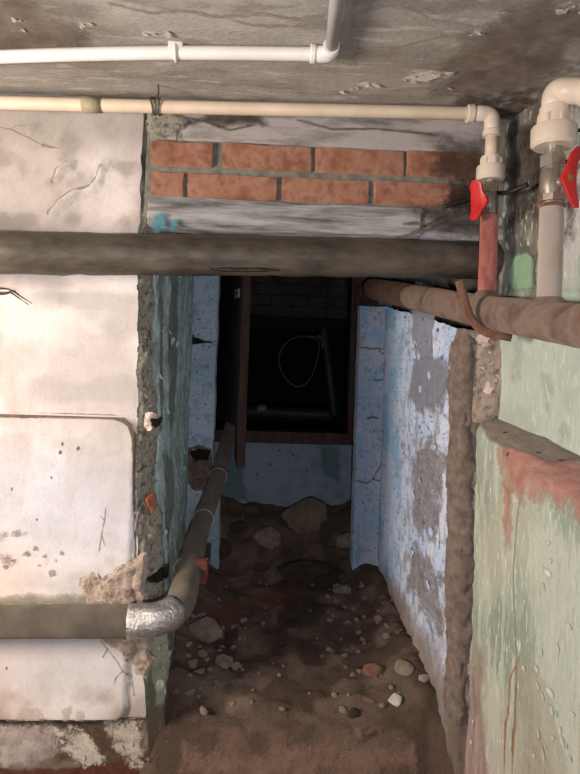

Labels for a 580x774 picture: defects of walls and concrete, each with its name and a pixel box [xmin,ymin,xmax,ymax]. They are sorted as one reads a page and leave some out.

damp [0,3,78,50]
damp [443,4,580,94]
crack [176,115,251,141]
crack [297,119,435,136]
spalling [403,310,577,728]
damp [0,719,142,769]